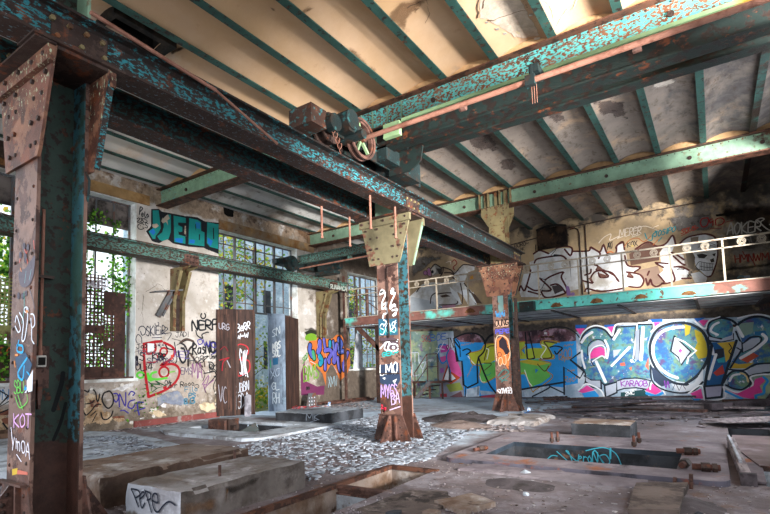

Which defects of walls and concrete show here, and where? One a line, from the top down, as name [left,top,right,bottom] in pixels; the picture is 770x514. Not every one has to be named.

flaking render [476,0,540,40]